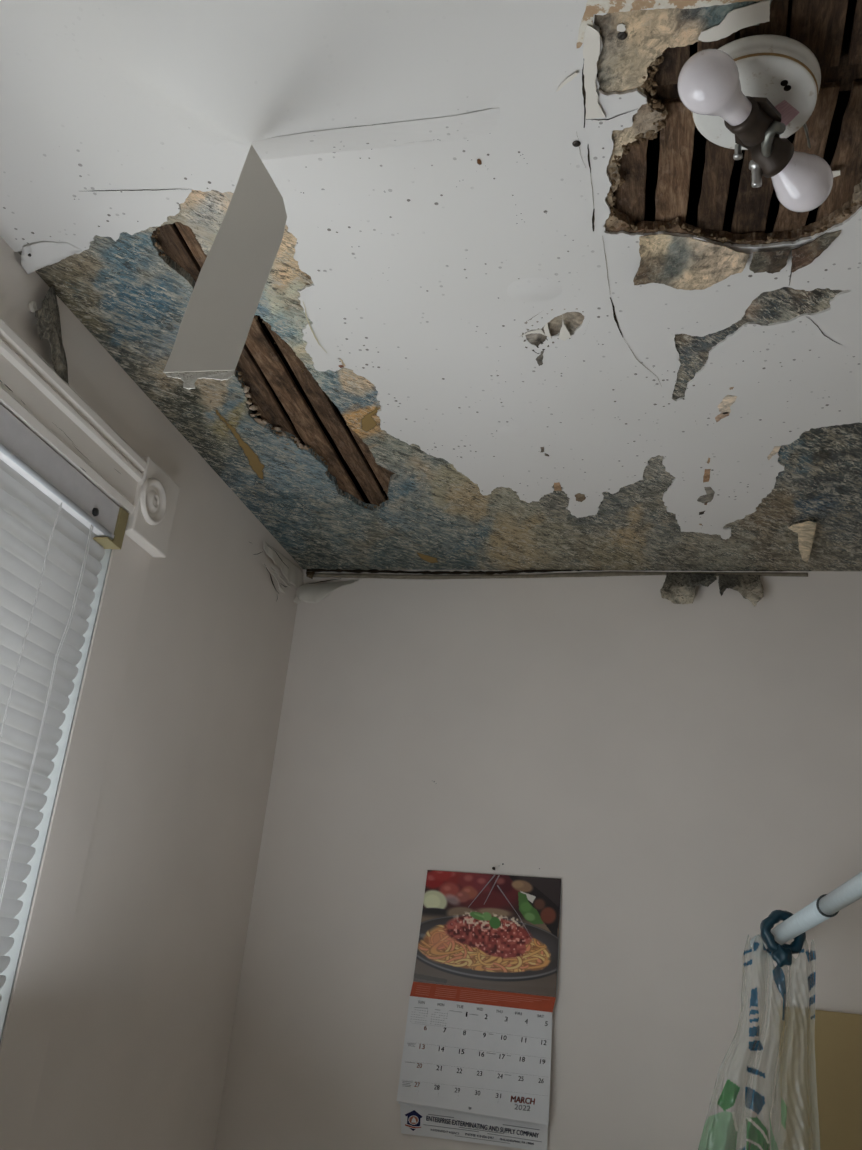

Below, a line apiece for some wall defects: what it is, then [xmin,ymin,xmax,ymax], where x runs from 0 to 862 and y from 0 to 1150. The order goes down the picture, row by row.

crack [576,63,662,387]
spalling [576,0,862,290]
water stain [215,409,265,479]
water stain [361,407,378,432]
peeling [18,190,862,606]